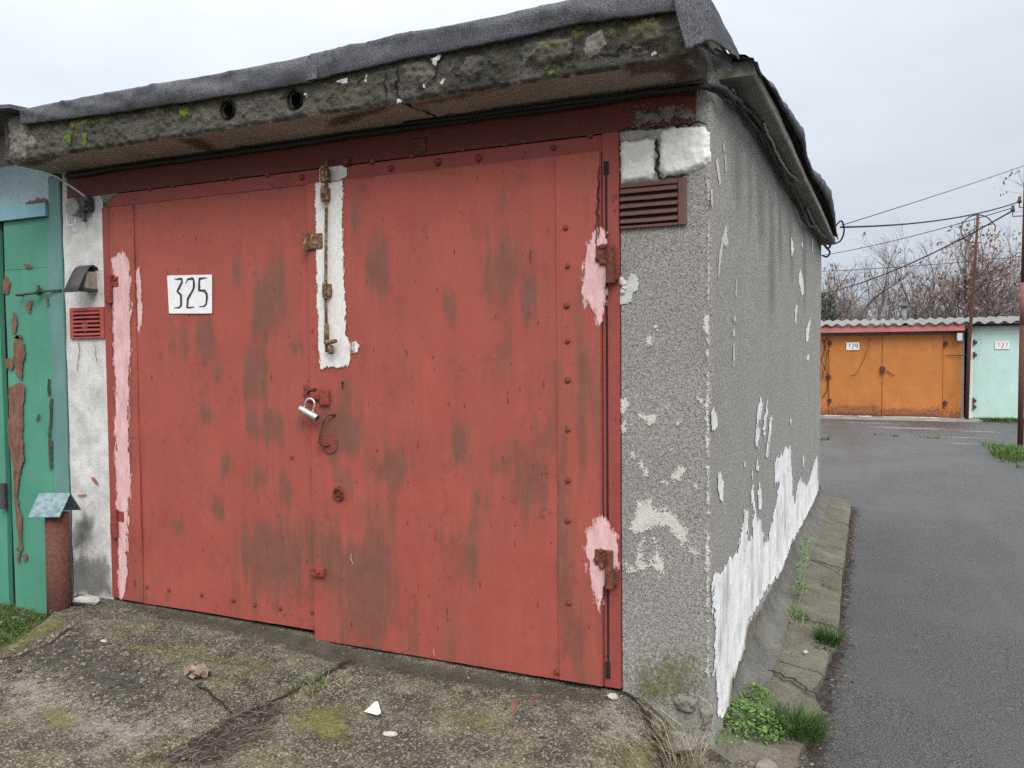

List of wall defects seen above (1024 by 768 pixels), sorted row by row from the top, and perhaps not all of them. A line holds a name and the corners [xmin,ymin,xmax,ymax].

crack [326,66,485,118]
spalling [619,104,727,226]
peeling [707,222,729,299]
peeling [794,270,811,361]
peeling [5,288,49,563]
spalling [660,313,724,517]
peeling [620,397,819,730]